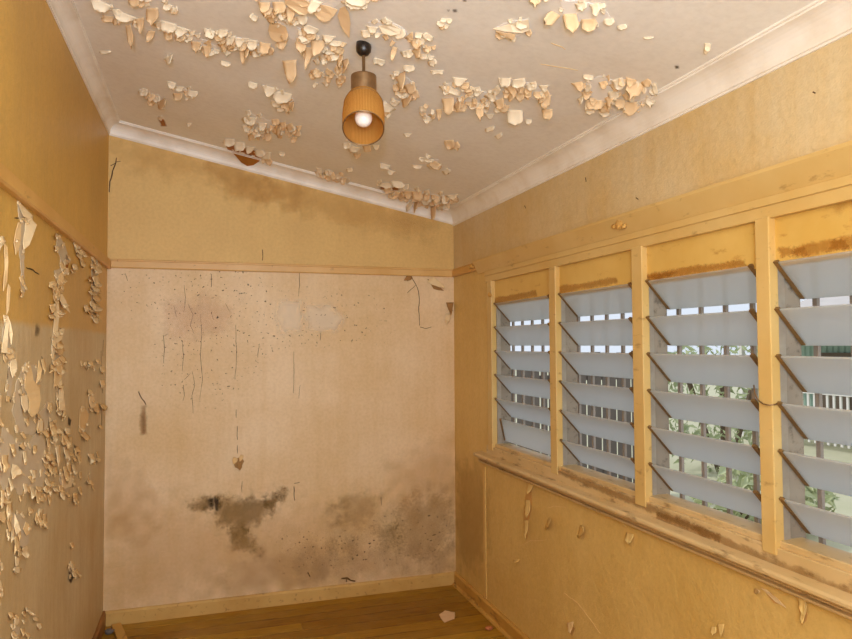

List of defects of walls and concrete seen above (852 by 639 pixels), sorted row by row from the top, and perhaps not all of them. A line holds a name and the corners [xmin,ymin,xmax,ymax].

peeling [529,0,628,33]
peeling [91,0,380,166]
peeling [361,17,553,139]
peeling [571,74,658,117]
peeling [314,168,353,185]
peeling [376,163,459,220]
peeling [412,154,451,175]
peeling [0,201,108,606]
peeling [8,607,42,639]